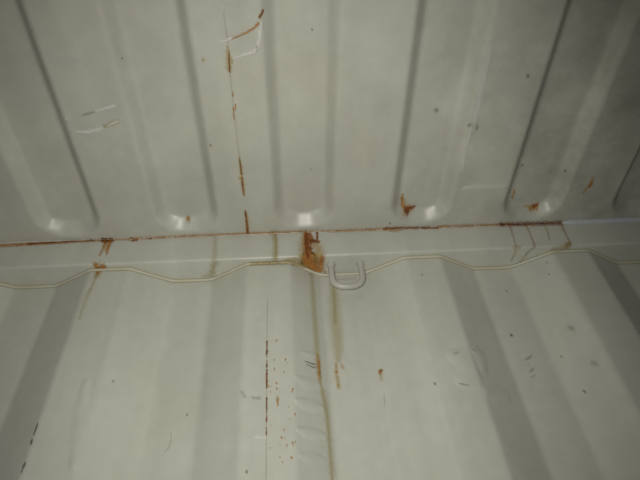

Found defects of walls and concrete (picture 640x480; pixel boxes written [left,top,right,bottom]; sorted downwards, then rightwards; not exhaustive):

corrosion [0,210,327,274]
corrosion [359,221,562,230]